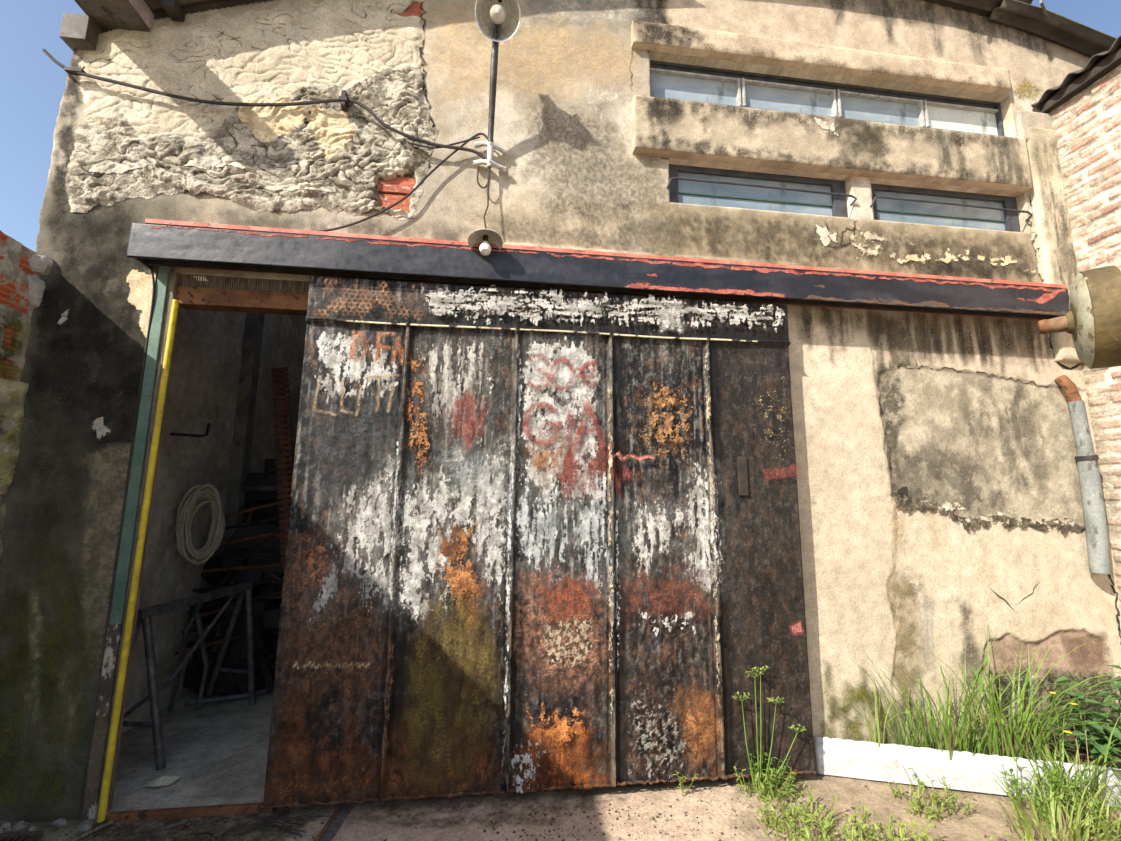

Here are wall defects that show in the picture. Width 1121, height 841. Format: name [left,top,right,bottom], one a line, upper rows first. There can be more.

damp [639,98,1027,184]
flaking render [375,173,416,213]
damp [864,228,1032,281]
damp [14,48,148,566]
peeling [126,269,156,338]
damp [801,309,1051,382]
rust [640,382,696,463]
peeling [142,209,1085,793]
rust [517,567,606,687]
flaking render [983,627,1110,679]
rust [520,703,605,794]
rust [626,690,719,785]